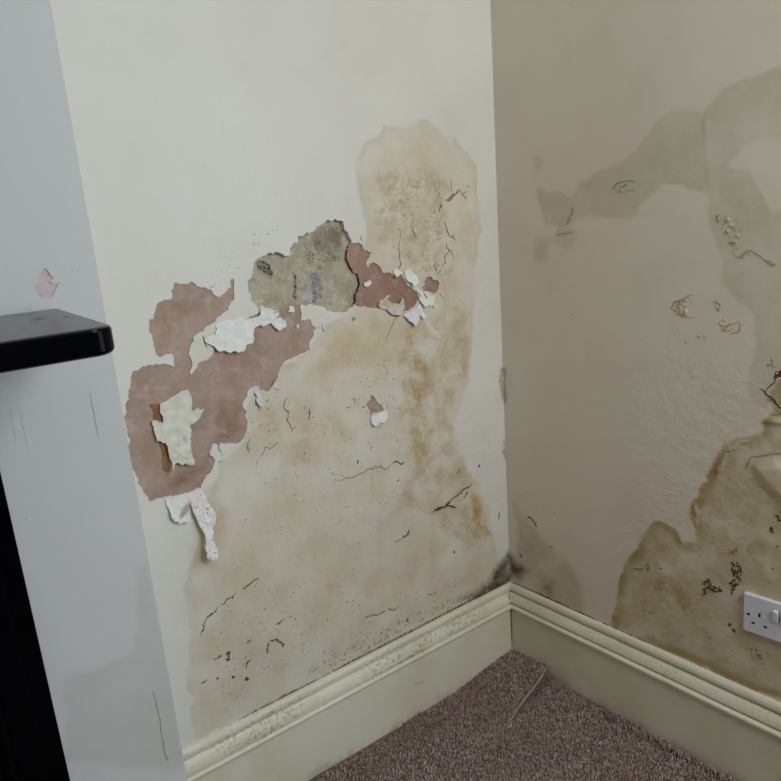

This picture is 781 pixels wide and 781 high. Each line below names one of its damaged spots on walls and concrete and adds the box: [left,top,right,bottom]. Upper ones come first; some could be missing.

crack [434,180,469,273]
peeling [34,268,59,299]
peeling [124,176,443,561]
crack [336,466,390,482]
mould [479,557,521,596]
mould [702,548,743,595]
crack [201,578,259,634]
damp [201,630,253,698]